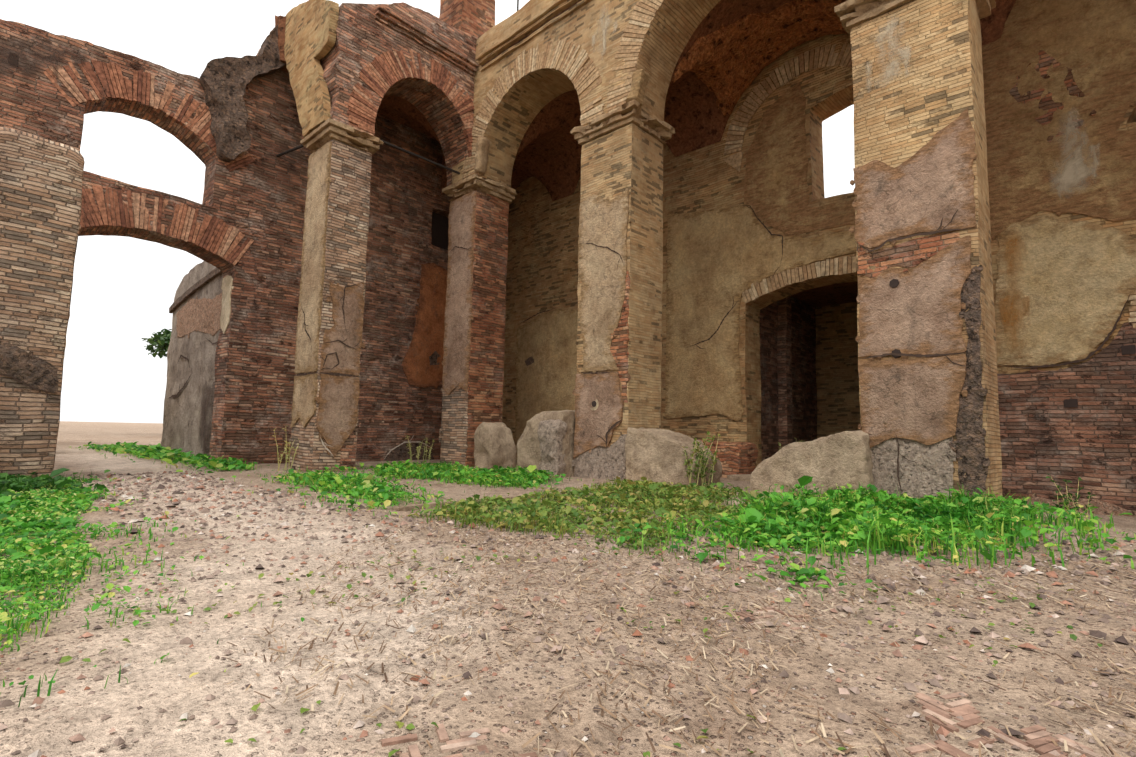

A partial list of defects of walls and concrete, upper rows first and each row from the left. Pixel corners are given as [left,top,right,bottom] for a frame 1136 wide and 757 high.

flaking render [289,141,365,471]
crack [297,280,365,377]
flaking render [384,191,477,466]
flaking render [663,0,1136,517]
crack [856,210,971,254]